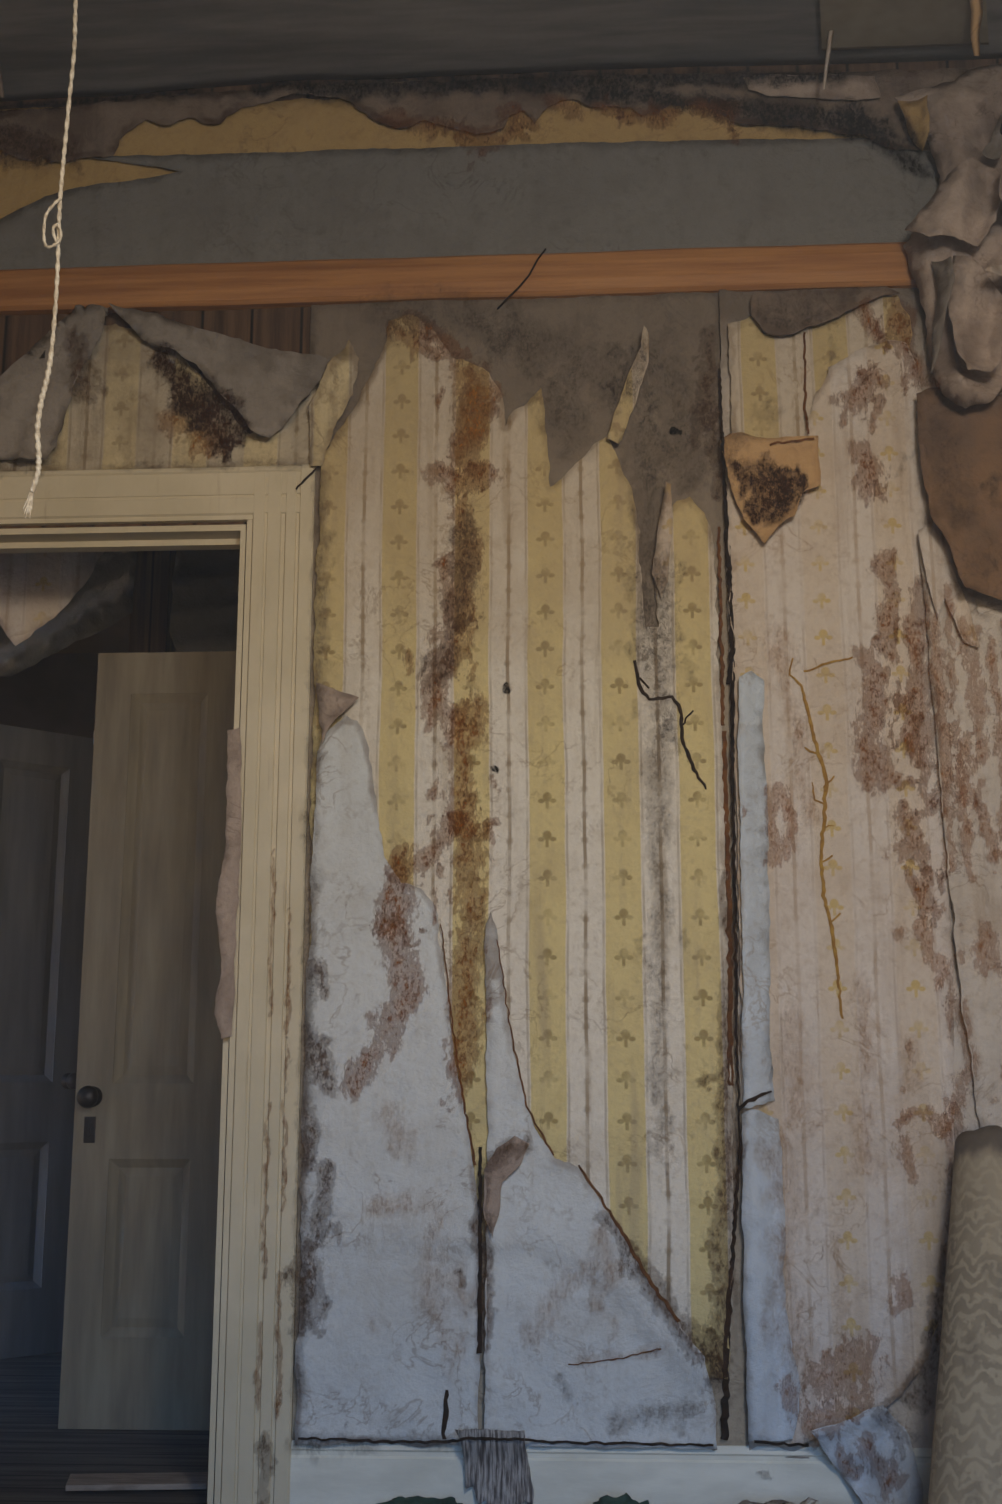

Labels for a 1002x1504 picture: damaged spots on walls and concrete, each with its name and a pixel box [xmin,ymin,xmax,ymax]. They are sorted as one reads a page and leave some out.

water stain [149,341,250,463]
water stain [693,329,808,524]
water stain [307,311,499,1098]
crack [295,368,809,1447]
water stain [855,552,1002,976]